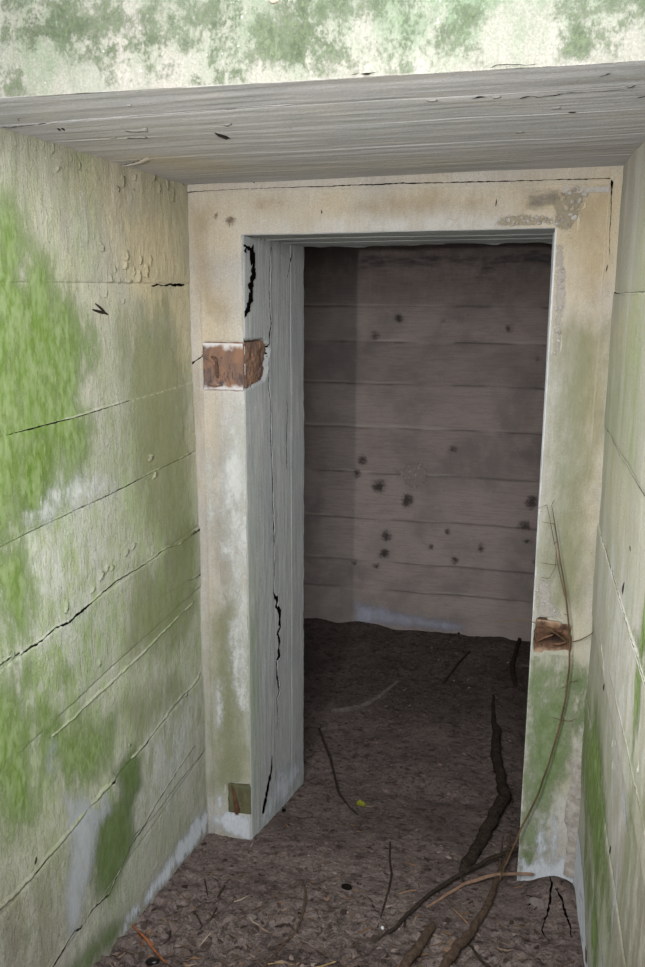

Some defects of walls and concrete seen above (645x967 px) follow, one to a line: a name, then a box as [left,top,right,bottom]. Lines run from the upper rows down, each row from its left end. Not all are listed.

damp [94,45,168,82]
damp [294,41,356,76]
damp [562,27,618,59]
spalling [498,188,588,229]
damp [19,434,107,526]
crack [243,244,292,728]
damp [0,549,34,650]
damp [633,600,645,730]
damp [38,709,114,786]
damp [119,754,139,801]
damp [68,799,110,927]
damp [518,813,618,967]